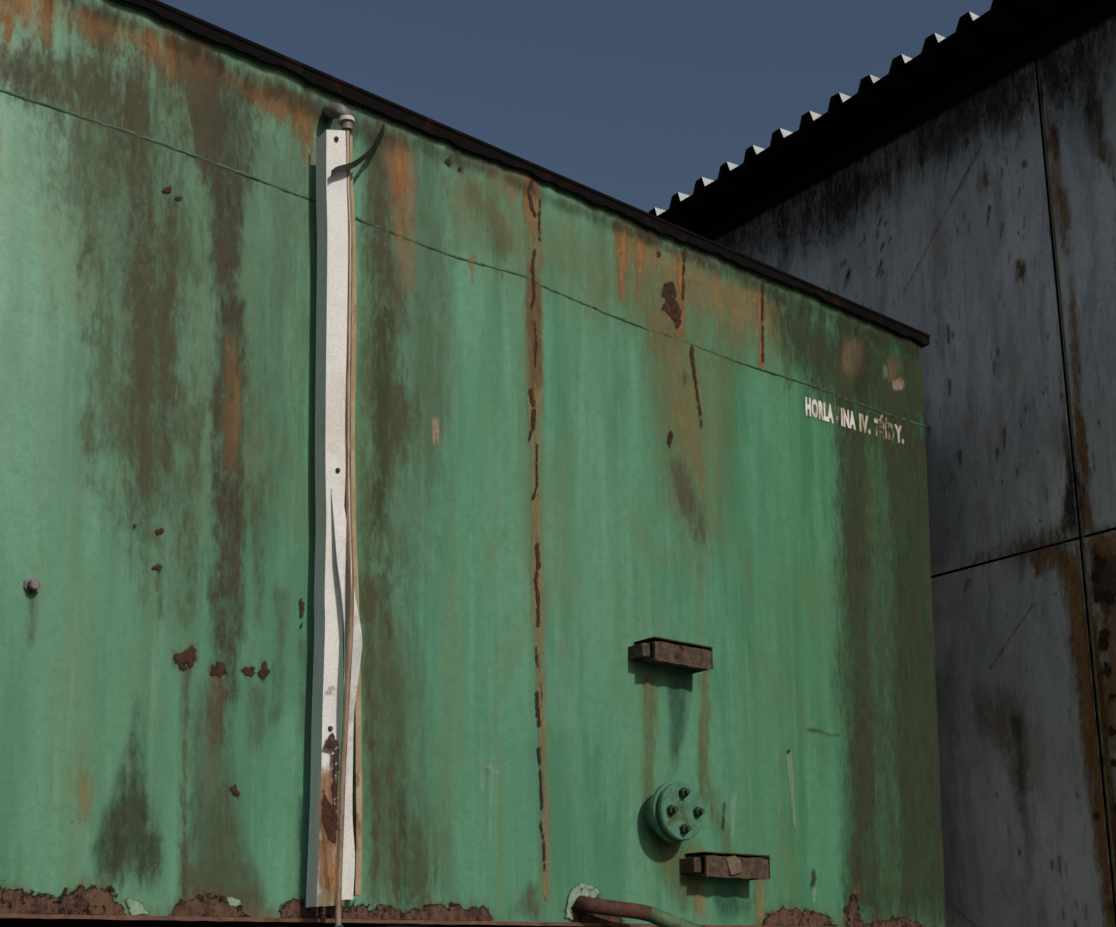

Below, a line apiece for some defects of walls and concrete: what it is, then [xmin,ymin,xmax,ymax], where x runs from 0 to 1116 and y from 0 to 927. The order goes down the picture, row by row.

corrosion [1,0,54,49]
damp [724,15,1116,251]
corrosion [616,226,781,467]
corrosion [173,645,197,699]
corrosion [210,661,227,731]
corrosion [241,661,271,680]
damp [781,314,945,924]
corrosion [976,291,1116,927]
corrosion [320,732,340,905]